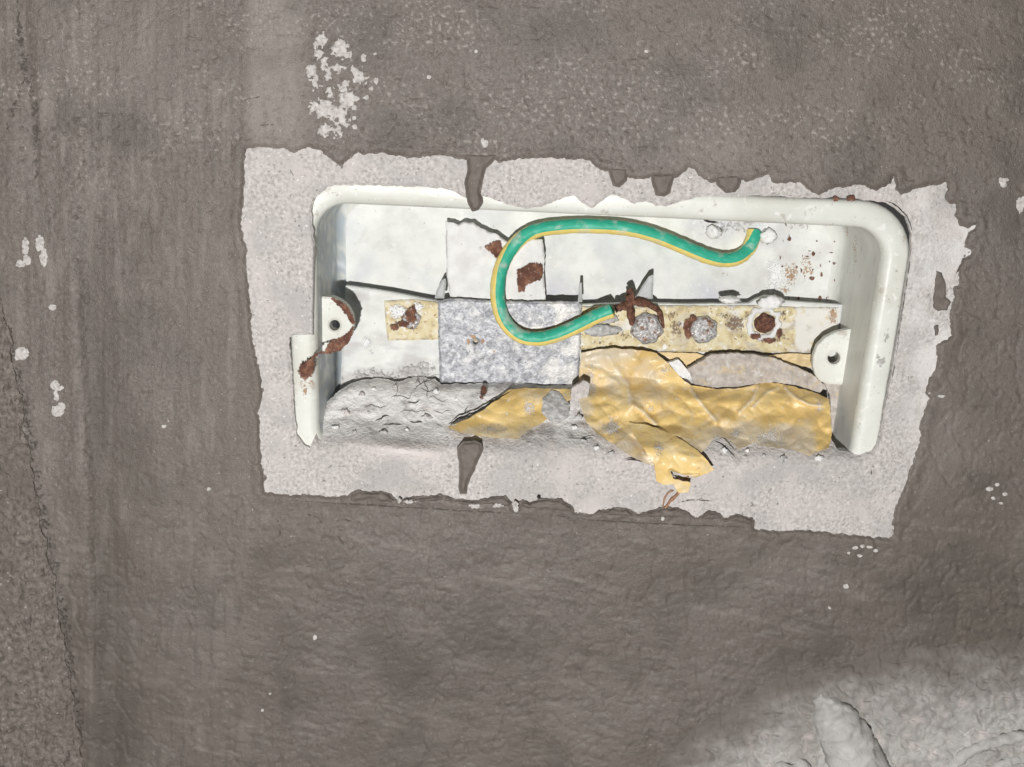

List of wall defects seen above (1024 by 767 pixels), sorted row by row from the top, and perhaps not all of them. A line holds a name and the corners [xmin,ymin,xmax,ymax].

peeling [306,31,378,139]
rust [297,298,355,395]
rust [390,306,416,331]
rust [484,241,502,258]
rust [517,263,544,292]
peeling [241,147,976,557]
rust [670,312,697,339]
crack [10,321,83,745]